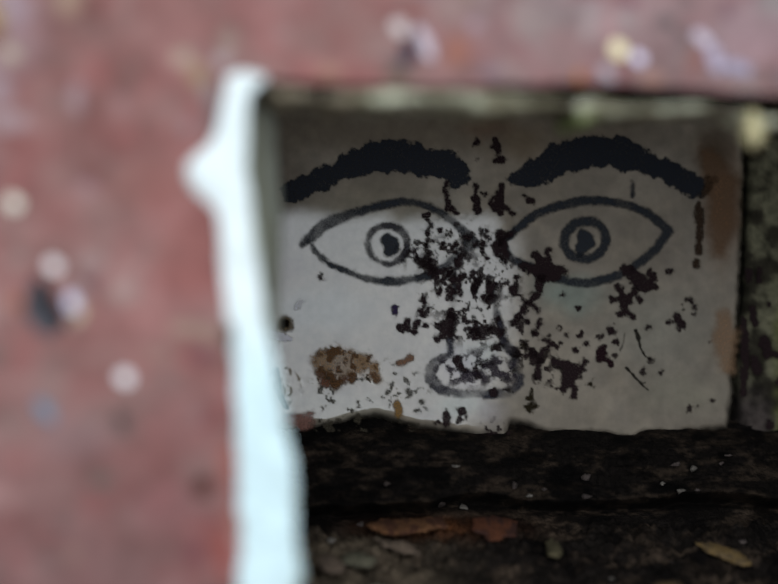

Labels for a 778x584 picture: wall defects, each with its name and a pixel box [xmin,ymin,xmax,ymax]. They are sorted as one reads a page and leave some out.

spalling [276,316,294,341]
corrosion [312,346,381,390]